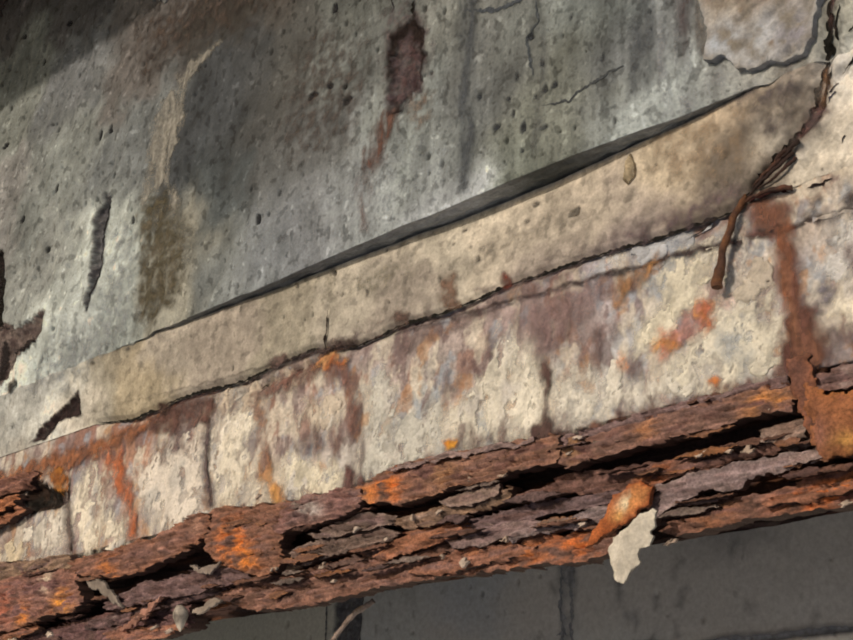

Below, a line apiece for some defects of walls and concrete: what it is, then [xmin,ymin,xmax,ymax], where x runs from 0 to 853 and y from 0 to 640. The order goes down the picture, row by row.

flaking render [698,0,824,73]
peeling [141,40,220,245]
rust [363,109,396,168]
rust [798,68,829,139]
spalling [83,195,112,310]
leakage [136,191,185,321]
crack [102,0,853,423]
peeling [314,206,853,479]
spalling [31,390,81,442]
peeling [136,355,323,532]
rust [0,201,853,640]
peeling [608,508,679,584]